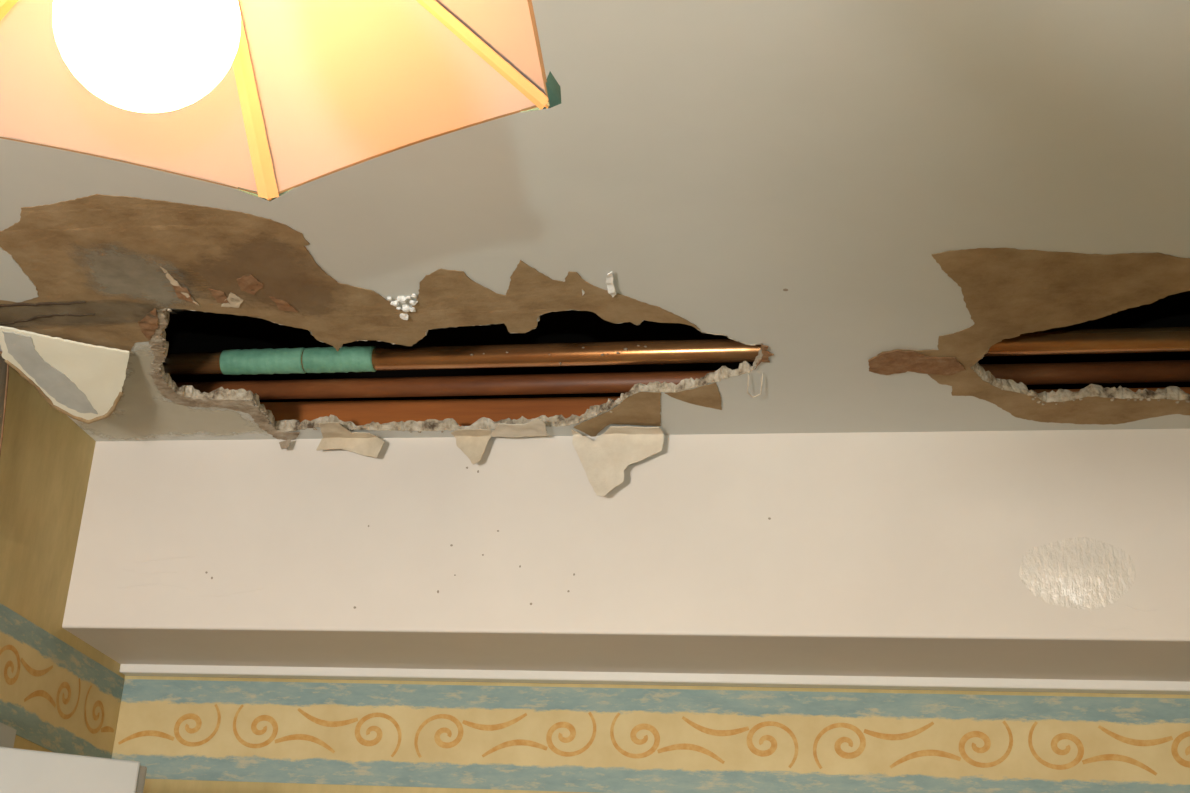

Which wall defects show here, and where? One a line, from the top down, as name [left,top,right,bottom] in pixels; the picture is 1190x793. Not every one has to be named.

peeling [387,294,418,320]
peeling [606,271,617,297]
peeling [0,326,130,455]
spalling [149,308,763,496]
spalling [971,347,1190,402]